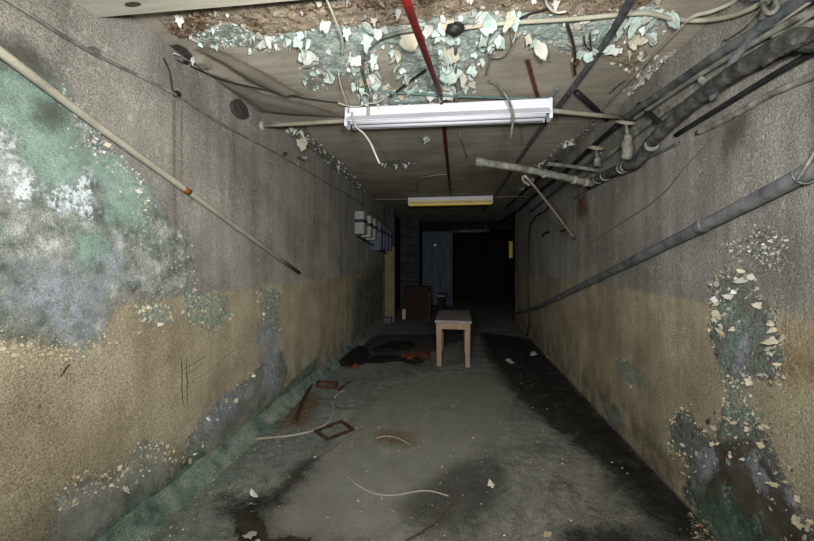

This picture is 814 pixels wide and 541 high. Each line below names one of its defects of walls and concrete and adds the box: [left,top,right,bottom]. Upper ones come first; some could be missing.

spalling [158,0,680,109]
leakage [0,127,99,226]
peeling [0,31,234,377]
leakage [12,260,102,342]
peeling [38,280,318,541]
leakage [480,333,709,538]
peeling [664,224,814,541]
leakage [225,458,315,541]
leakage [562,528,635,541]